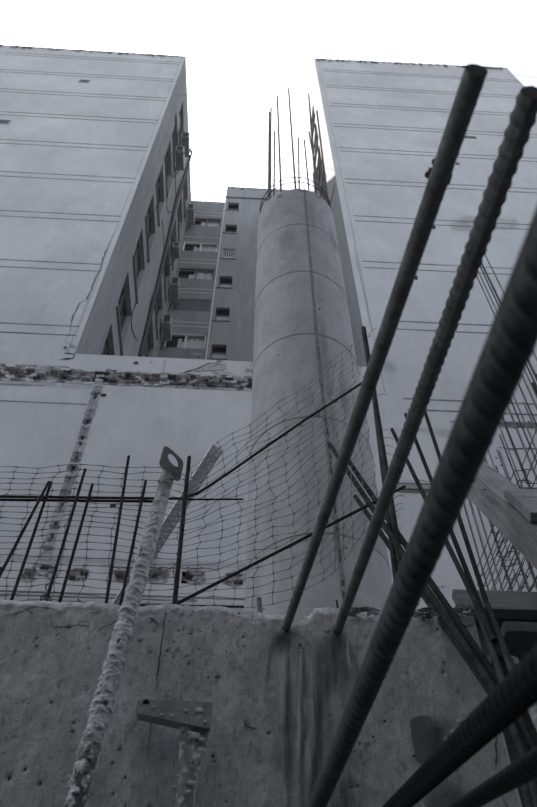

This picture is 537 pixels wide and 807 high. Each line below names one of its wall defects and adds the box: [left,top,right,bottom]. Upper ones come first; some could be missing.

spalling [0,344,252,397]
water stain [297,657,313,770]